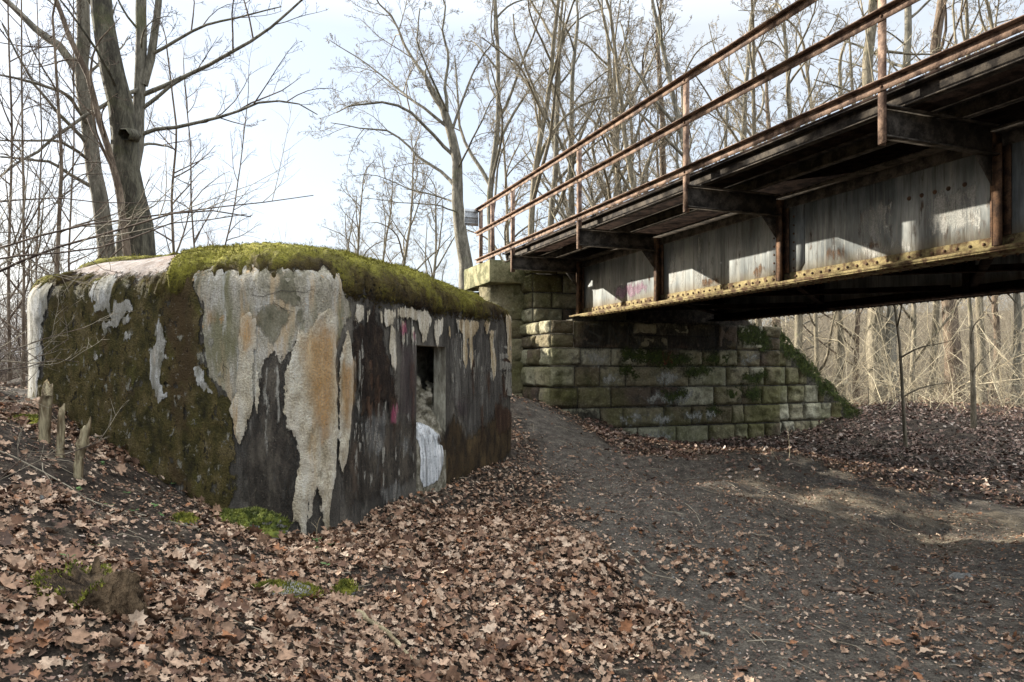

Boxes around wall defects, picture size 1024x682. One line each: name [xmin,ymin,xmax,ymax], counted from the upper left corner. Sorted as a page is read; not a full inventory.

peeling [27,282,52,399]
spalling [73,255,176,341]
peeling [192,263,351,403]
damp [229,304,512,535]